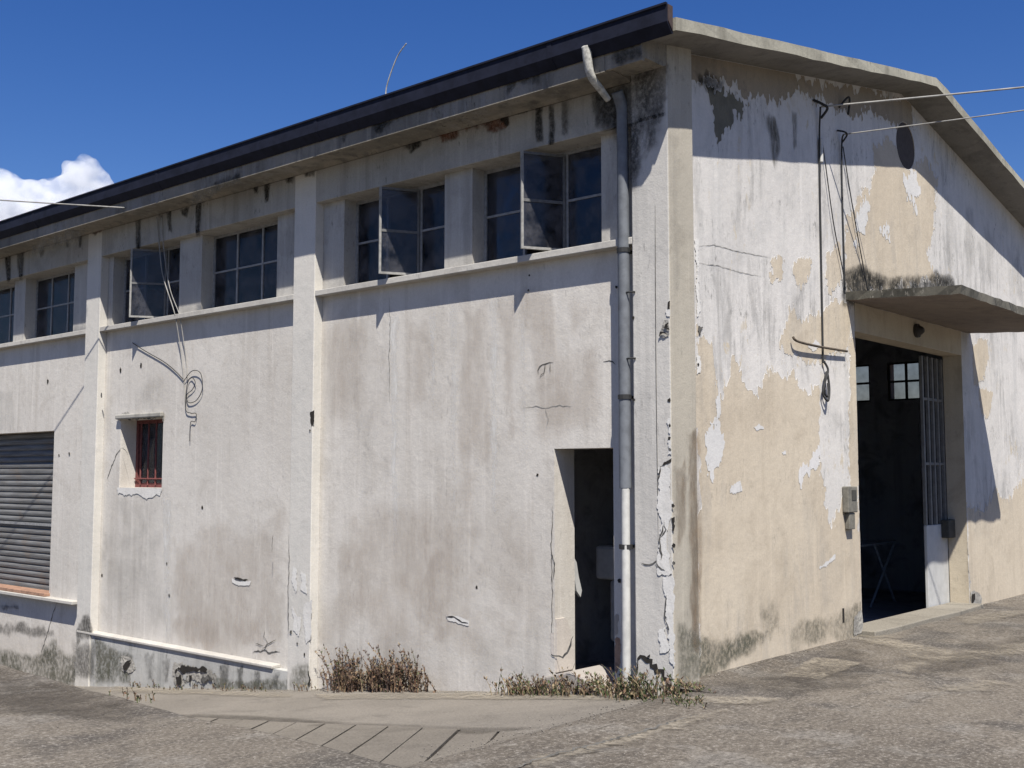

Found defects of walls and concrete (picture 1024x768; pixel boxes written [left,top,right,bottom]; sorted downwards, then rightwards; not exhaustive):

water stain [594,70,663,184]
water stain [768,119,779,153]
water stain [843,265,954,304]
peeling [691,54,939,676]
peeling [972,338,993,420]
flaking render [232,577,251,586]
crack [254,537,290,654]
flaking render [446,616,469,626]
peeling [657,418,675,667]
water stain [0,617,284,714]
flaking render [172,662,216,687]